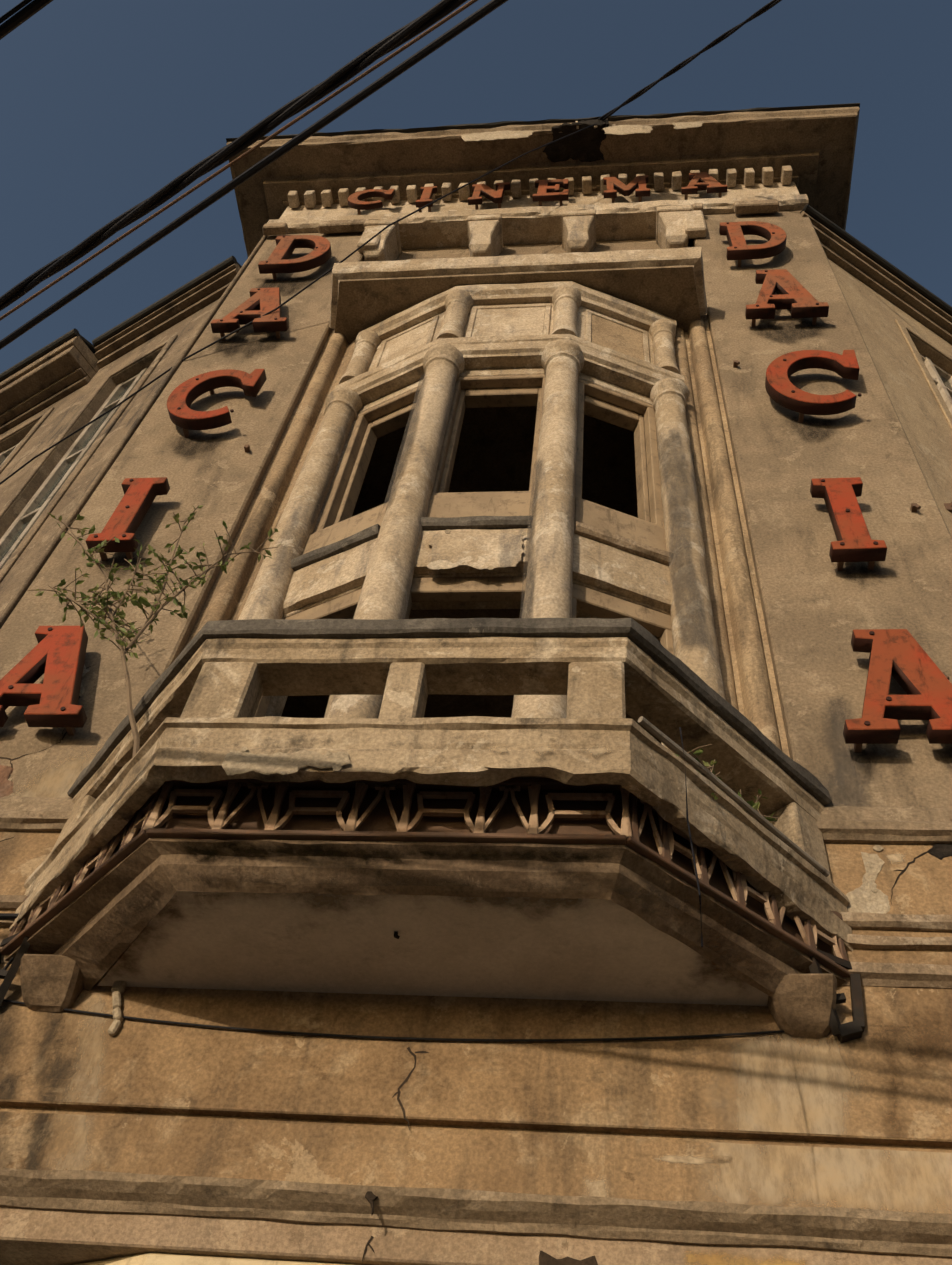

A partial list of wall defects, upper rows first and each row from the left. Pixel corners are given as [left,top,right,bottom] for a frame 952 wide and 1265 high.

peeling [461,130,534,141]
spalling [542,118,653,163]
peeling [672,121,704,129]
peeling [424,529,527,570]
spalling [0,765,14,798]
peeling [222,747,351,775]
peeling [846,845,903,914]
crack [890,848,931,904]
leakage [0,991,14,1060]
leakage [25,1002,105,1170]
crack [392,1047,429,1130]